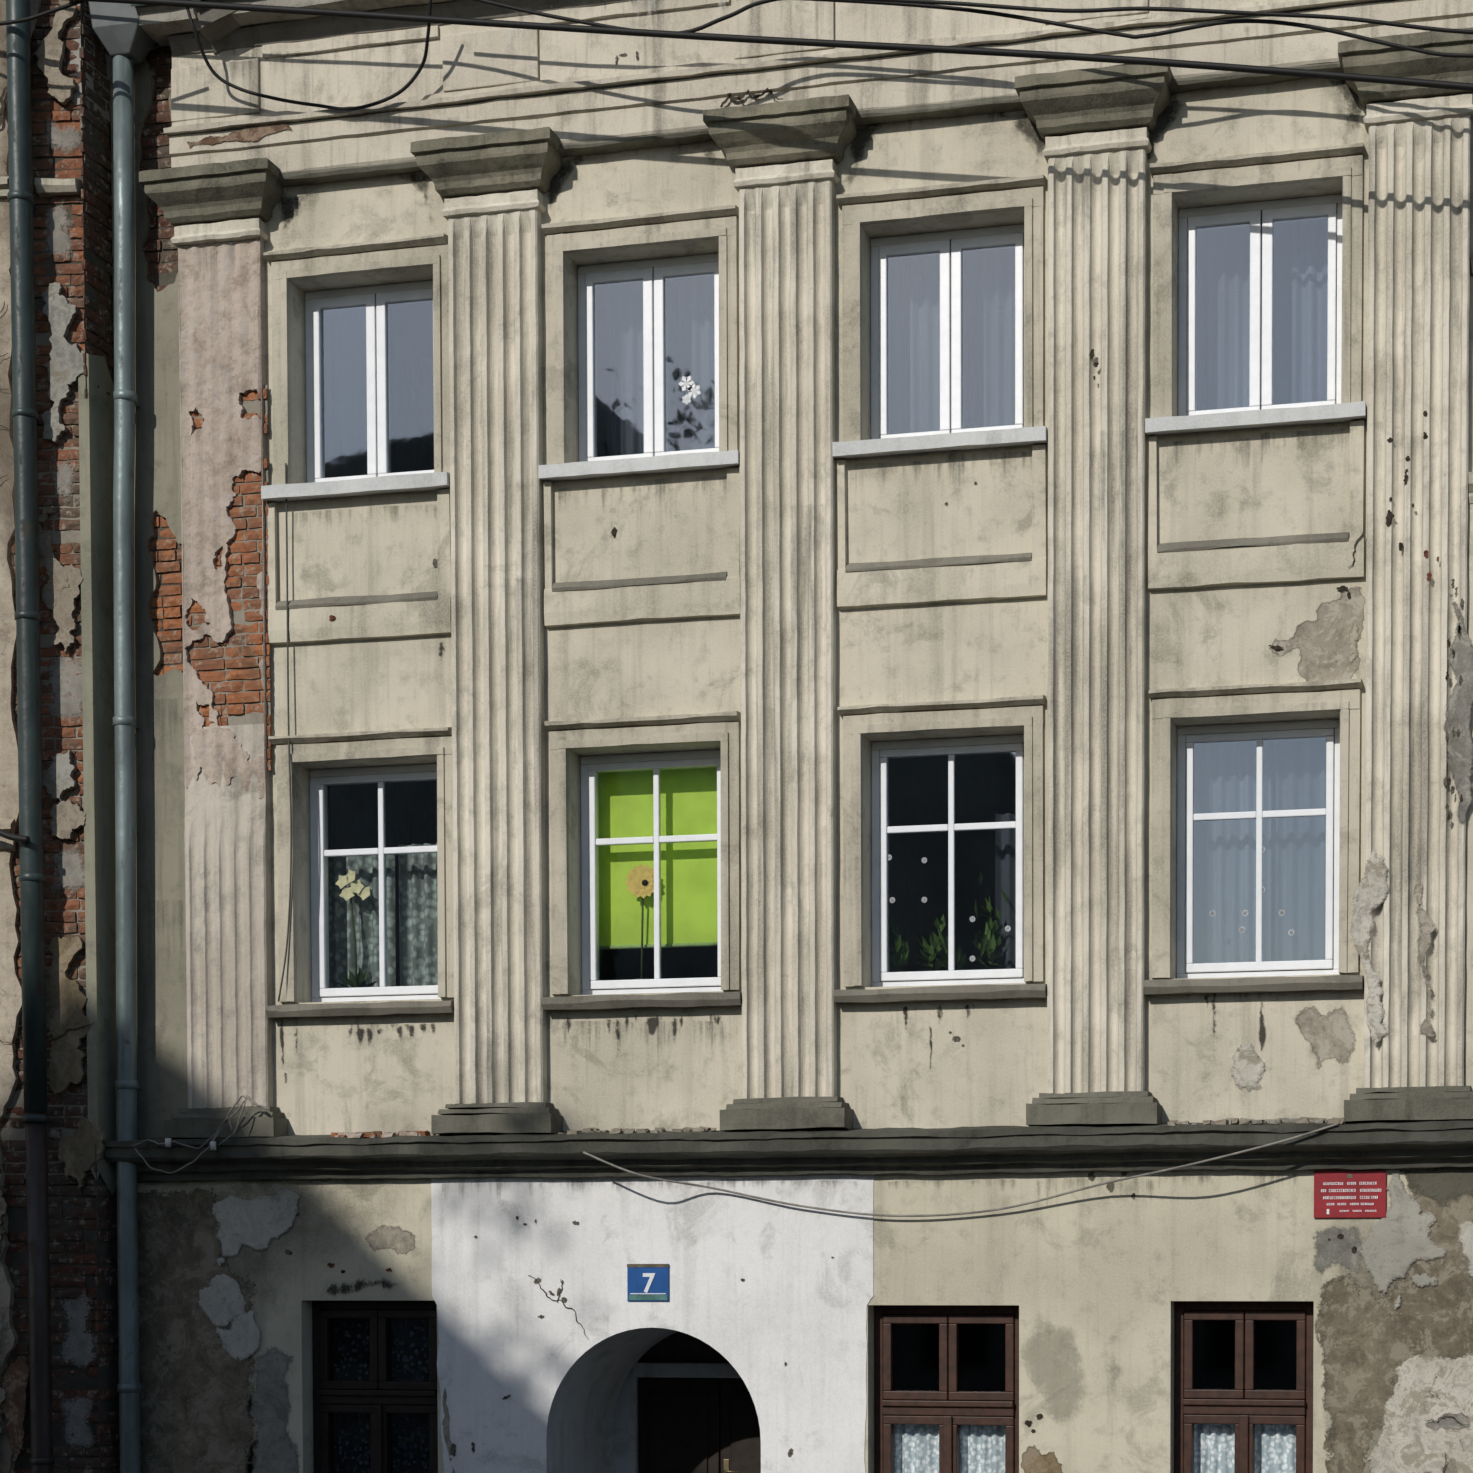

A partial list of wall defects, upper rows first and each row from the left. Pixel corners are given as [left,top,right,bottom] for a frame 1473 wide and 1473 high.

peeling [33,0,79,105]
peeling [42,282,85,443]
peeling [39,506,83,655]
flaking render [149,458,271,771]
flaking render [1268,585,1365,682]
flaking render [1443,579,1473,823]
peeling [42,750,86,840]
flaking render [1295,850,1389,1068]
flaking render [138,1188,301,1473]
crack [528,1275,589,1340]
flaking render [1313,1167,1473,1473]
flaking render [1021,1414,1062,1473]